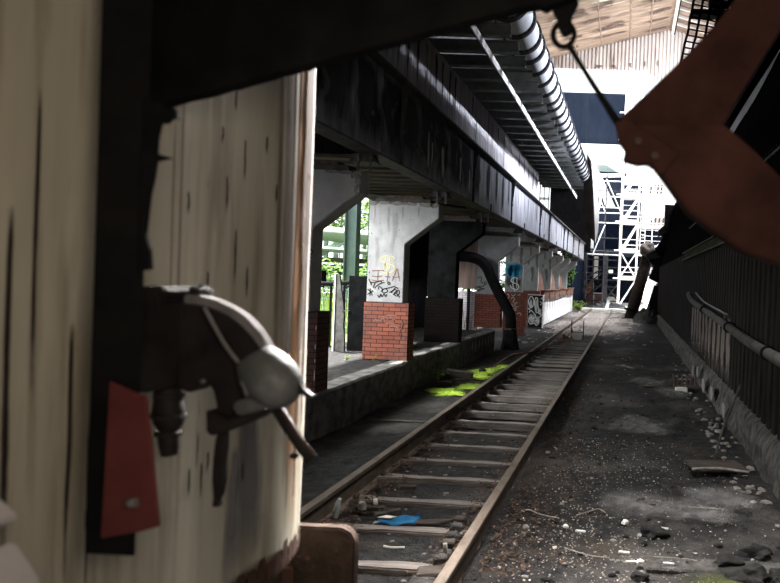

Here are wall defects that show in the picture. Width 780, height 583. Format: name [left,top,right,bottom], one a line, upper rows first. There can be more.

corrosion [291,69,315,377]
leakage [398,42,457,105]